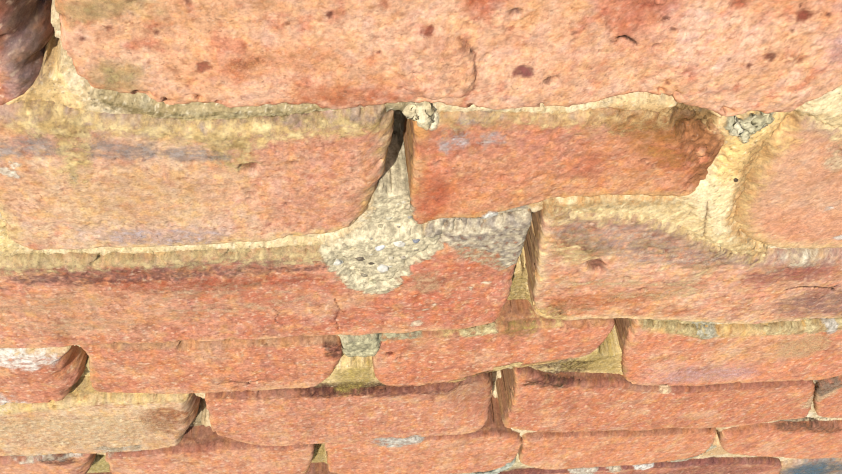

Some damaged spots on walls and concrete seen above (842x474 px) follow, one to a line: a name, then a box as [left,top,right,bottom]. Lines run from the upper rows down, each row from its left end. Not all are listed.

water stain [0,348,58,371]
water stain [15,453,82,465]